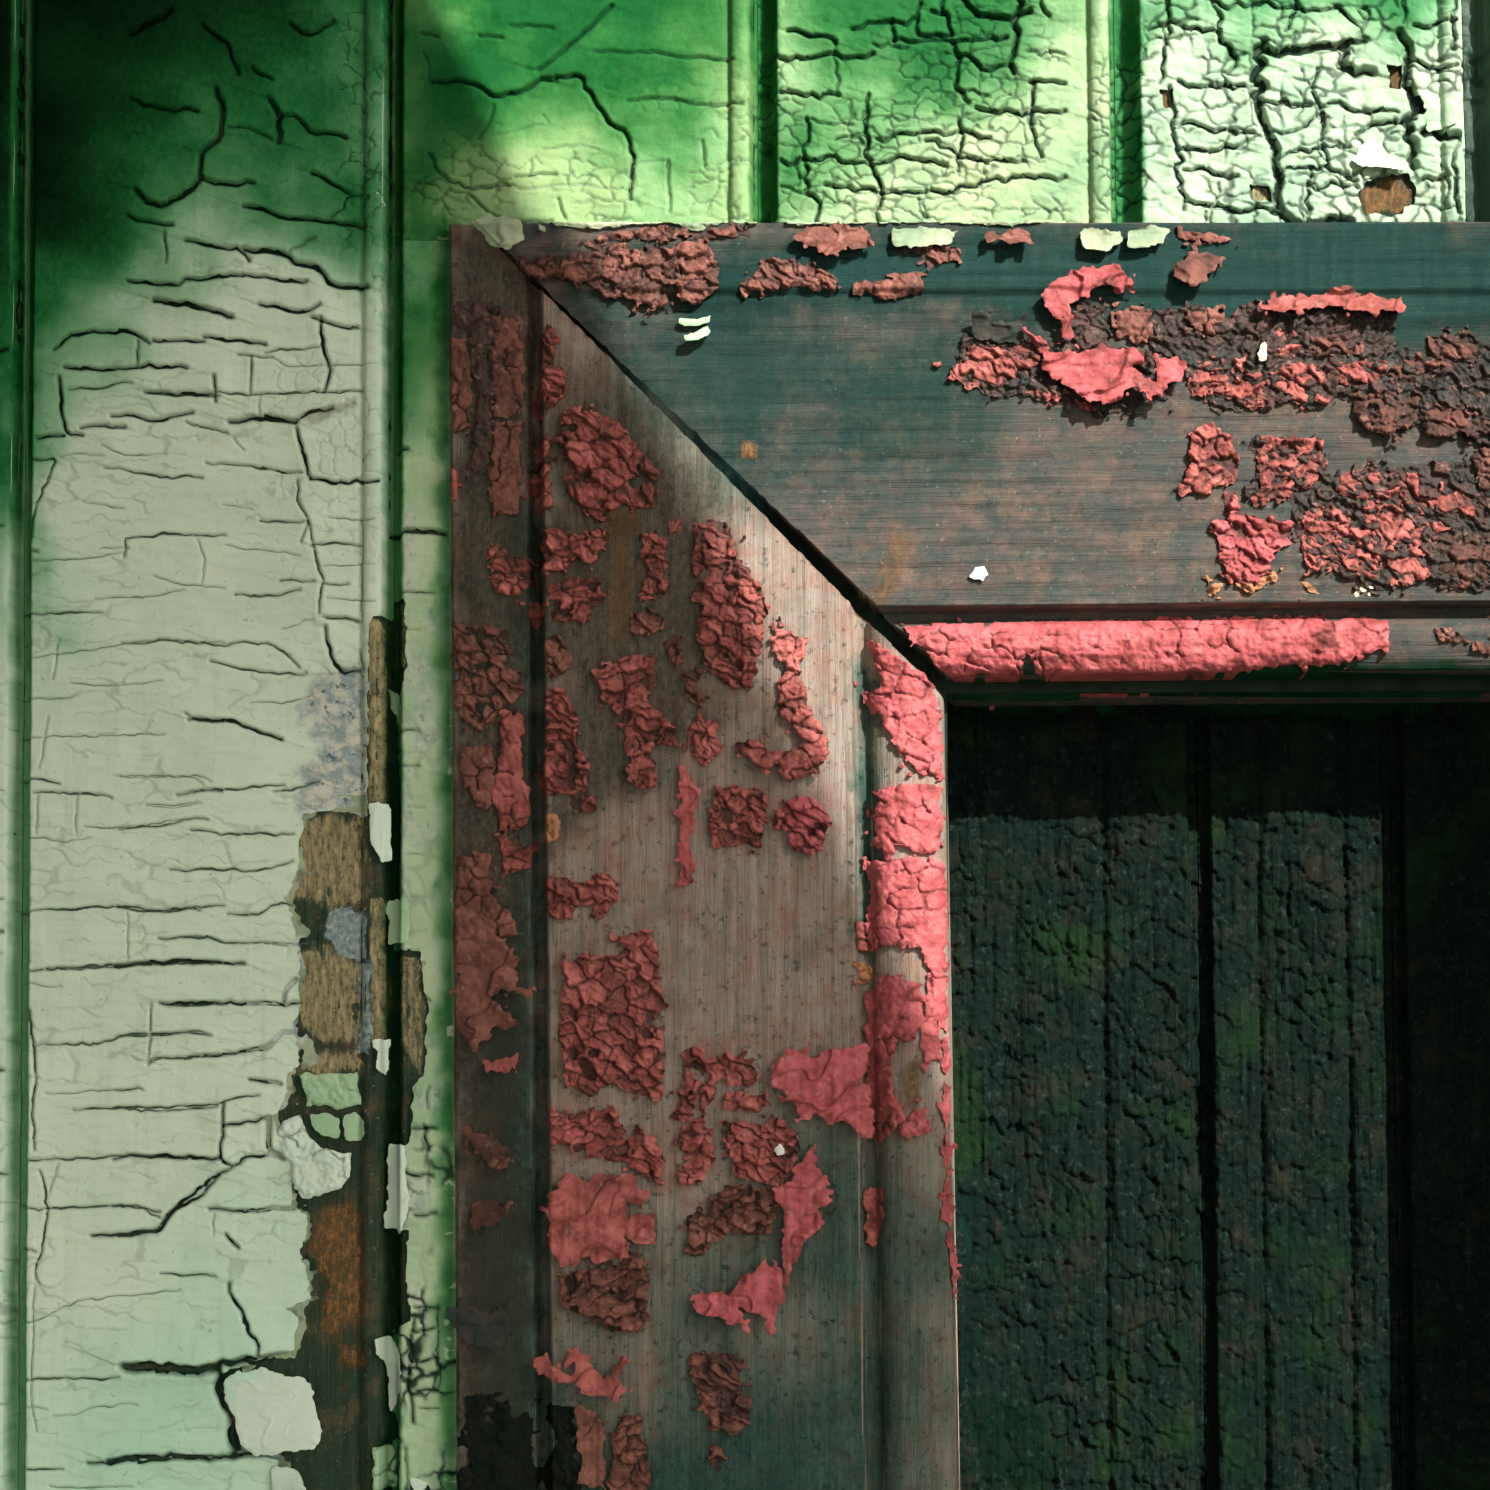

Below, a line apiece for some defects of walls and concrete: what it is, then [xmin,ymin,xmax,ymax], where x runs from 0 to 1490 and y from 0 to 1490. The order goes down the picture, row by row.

crack [416,52,742,223]
crack [781,0,1064,220]
crack [1149,0,1461,222]
peeling [1352,139,1409,214]
crack [0,139,439,1489]
peeling [277,603,426,1199]
peeling [448,213,1490,1490]
peeling [384,1144,410,1234]
peeling [224,1367,322,1490]
peeling [375,1336,401,1411]
peeling [372,1444,428,1490]